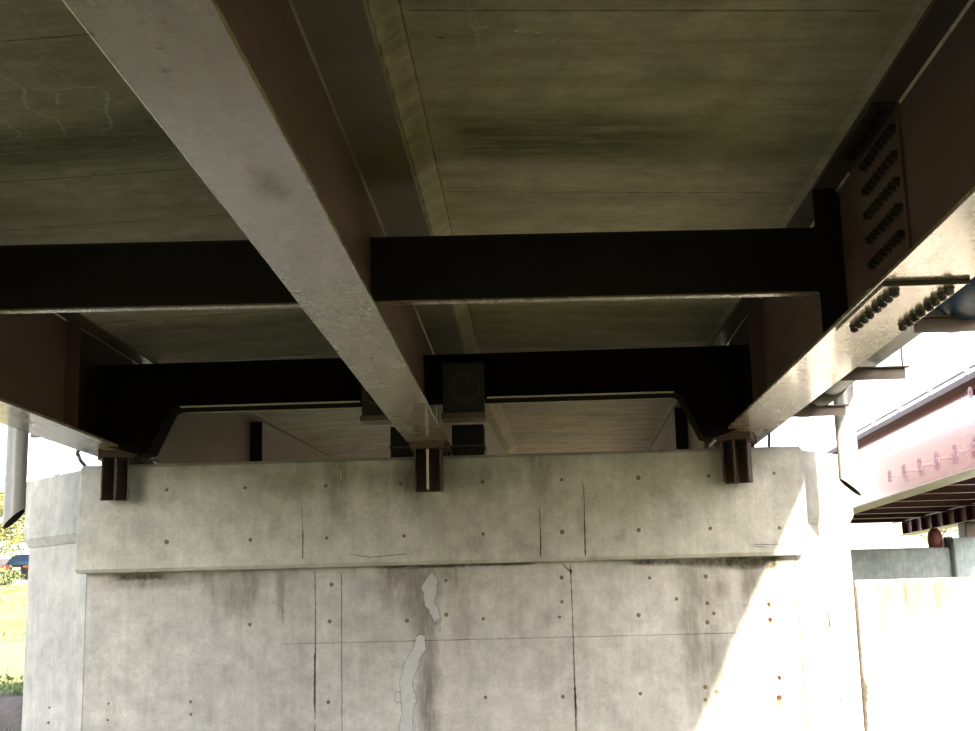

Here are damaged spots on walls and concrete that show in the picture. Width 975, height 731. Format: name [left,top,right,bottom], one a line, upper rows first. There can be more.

crack [0,73,114,138]